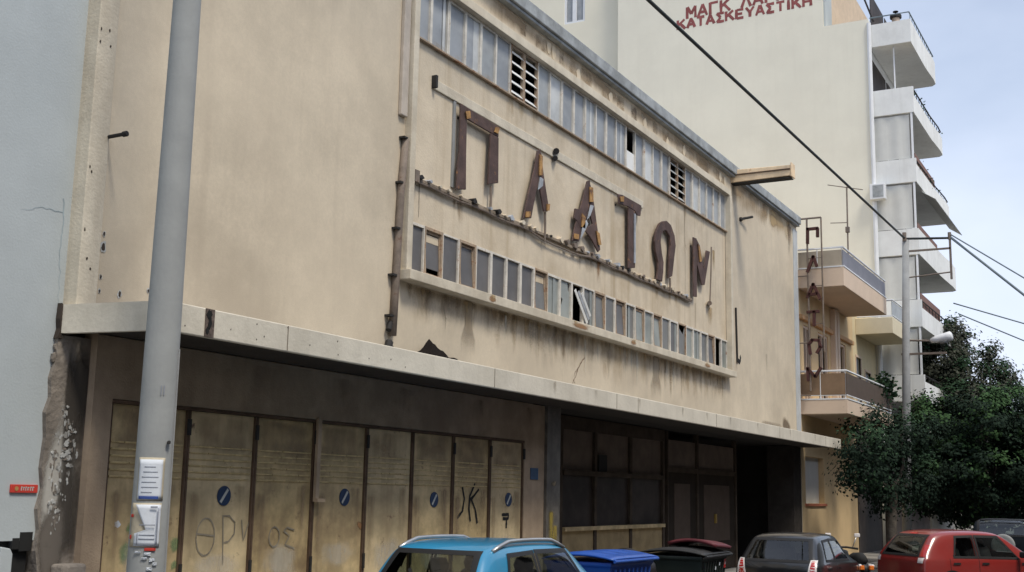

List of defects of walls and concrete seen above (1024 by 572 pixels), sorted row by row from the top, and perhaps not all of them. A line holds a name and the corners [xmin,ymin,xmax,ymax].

spalling [50,303,63,362]
water stain [464,301,574,343]
water stain [619,348,696,383]
flaking render [38,356,89,572]